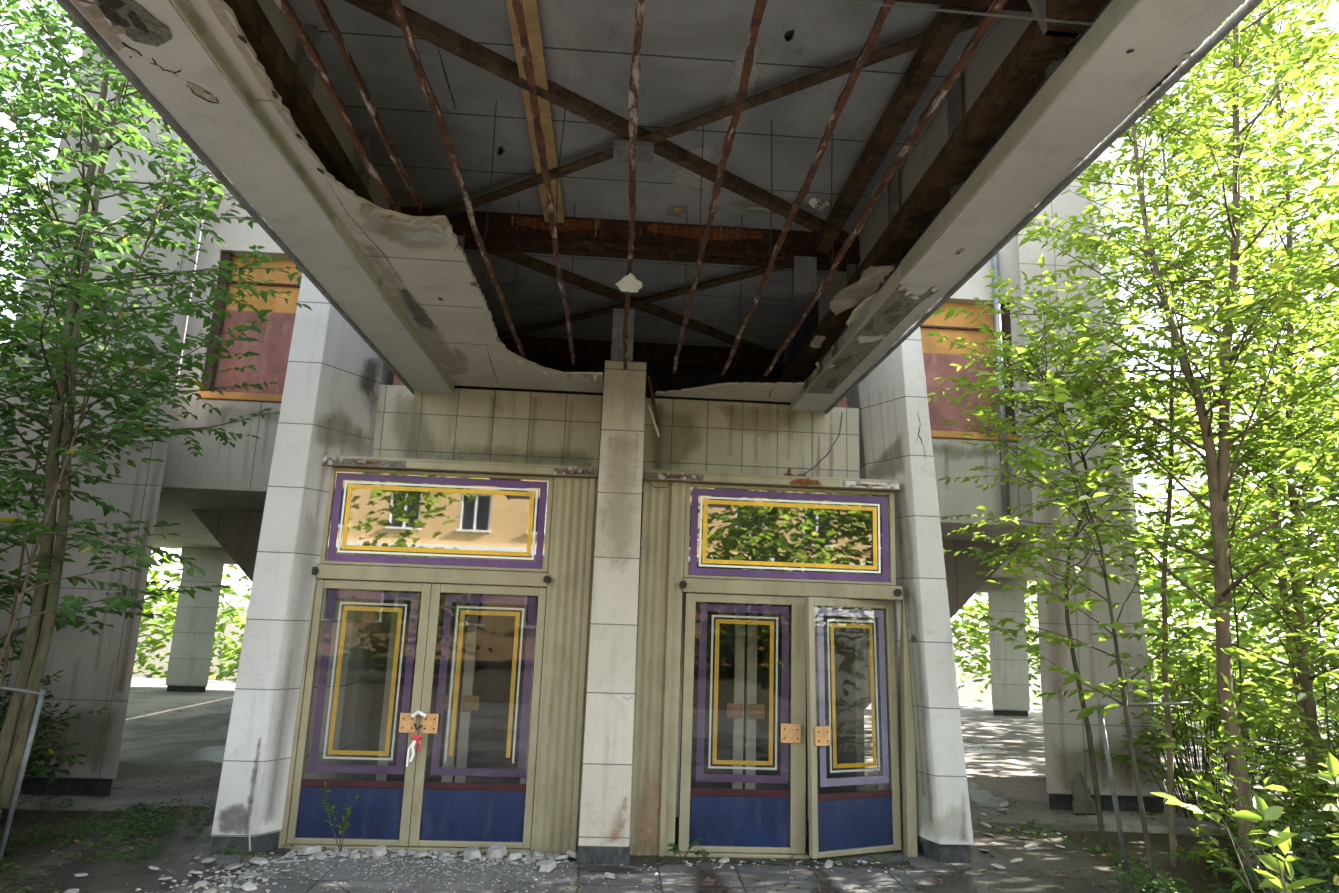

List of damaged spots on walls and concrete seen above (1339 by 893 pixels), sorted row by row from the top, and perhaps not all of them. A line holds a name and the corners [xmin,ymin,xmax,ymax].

peeling [72,0,172,56]
peeling [808,198,830,209]
peeling [803,265,939,394]
leakage [9,740,260,893]